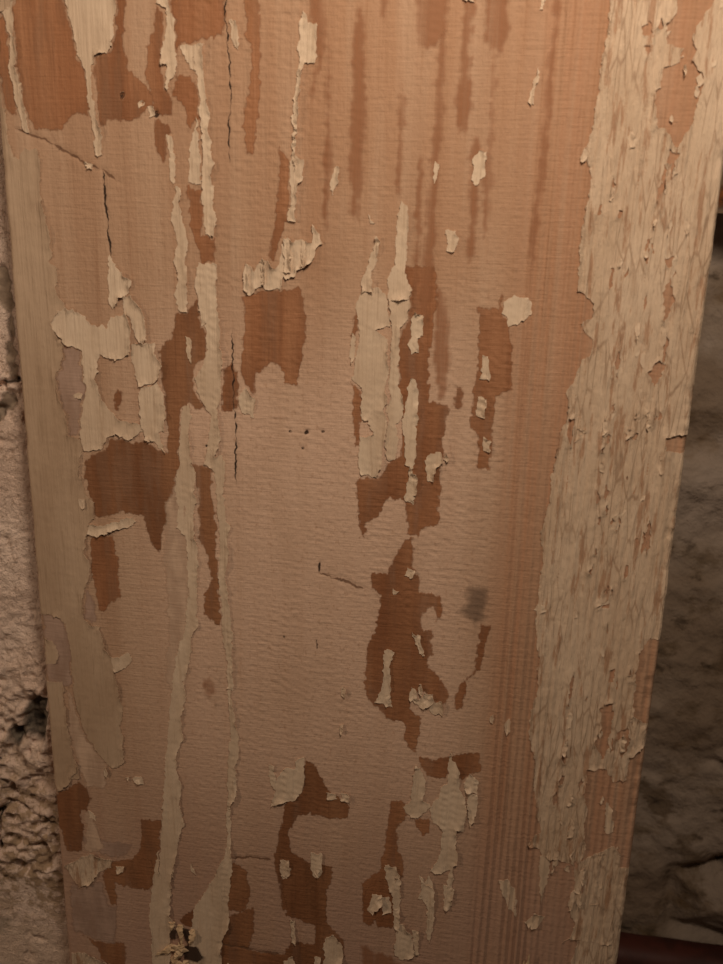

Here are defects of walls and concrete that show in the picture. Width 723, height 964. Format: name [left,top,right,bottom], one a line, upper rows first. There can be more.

peeling [0,0,350,964]
peeling [349,201,532,960]
peeling [471,150,487,186]
peeling [499,879,544,930]
peeling [528,0,723,964]